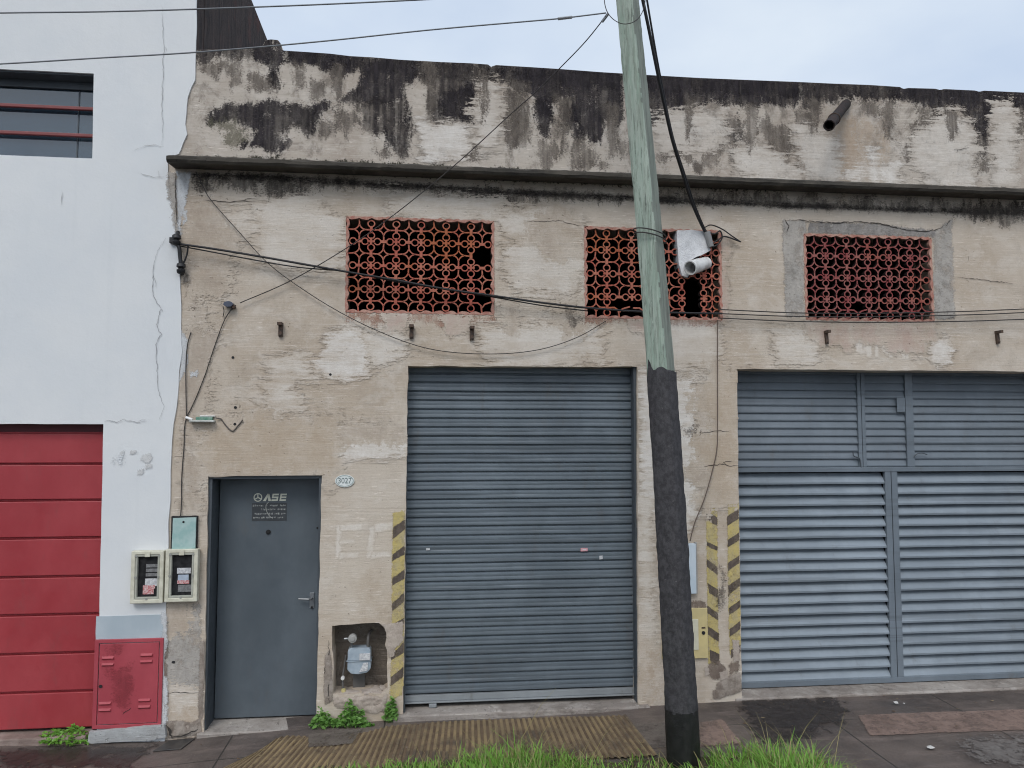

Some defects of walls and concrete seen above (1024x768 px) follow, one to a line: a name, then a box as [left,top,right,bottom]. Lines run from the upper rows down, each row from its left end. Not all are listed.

crack [140,22,167,148]
damp [196,39,630,171]
damp [647,75,1024,228]
crack [107,173,177,423]
damp [173,170,634,525]
flaking render [323,651,387,714]
flaking render [382,621,404,657]